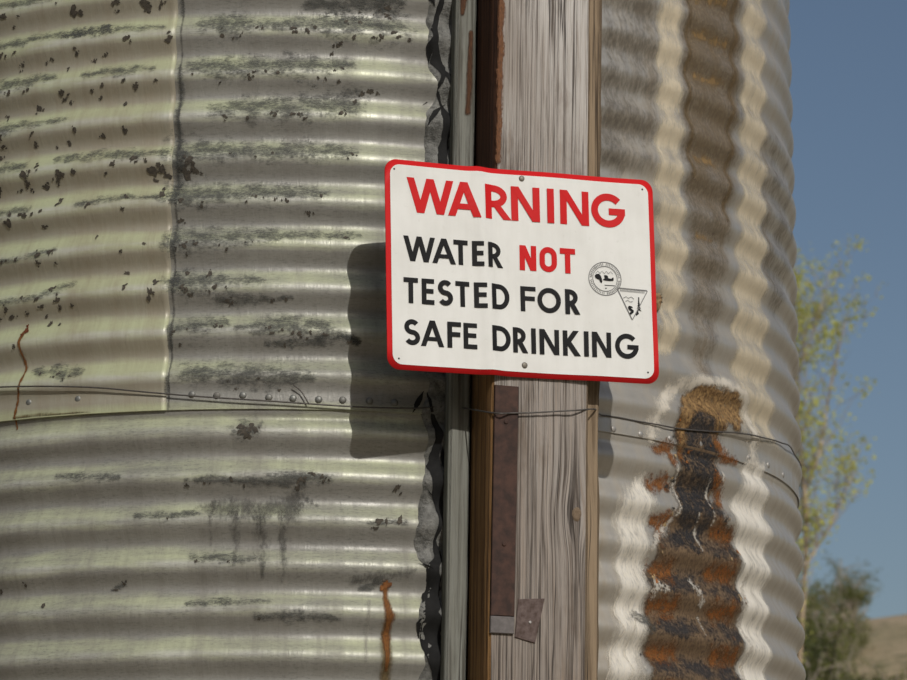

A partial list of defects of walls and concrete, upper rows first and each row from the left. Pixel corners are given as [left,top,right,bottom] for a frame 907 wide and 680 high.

rust [12,324,83,430]
rust [632,383,747,680]
rust [354,577,395,680]